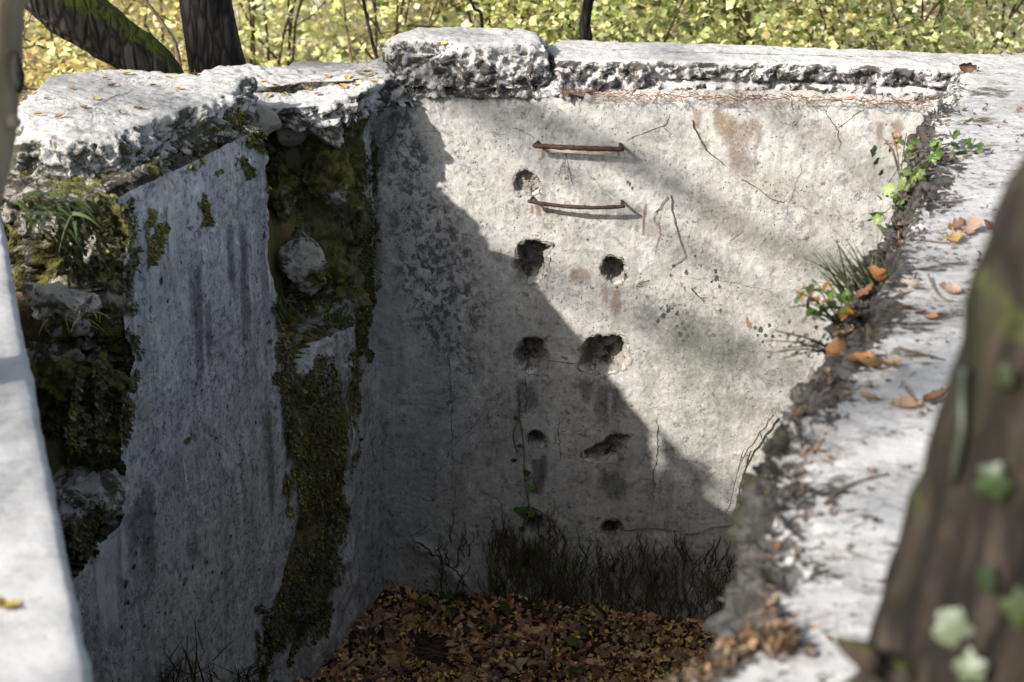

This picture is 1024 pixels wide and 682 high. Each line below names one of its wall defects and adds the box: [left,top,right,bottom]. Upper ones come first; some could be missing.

spalling [512,168,542,197]
spalling [511,237,554,286]
spalling [596,255,650,288]
spalling [513,335,551,376]
spalling [576,332,633,378]
spalling [526,428,549,449]
spalling [579,432,634,466]